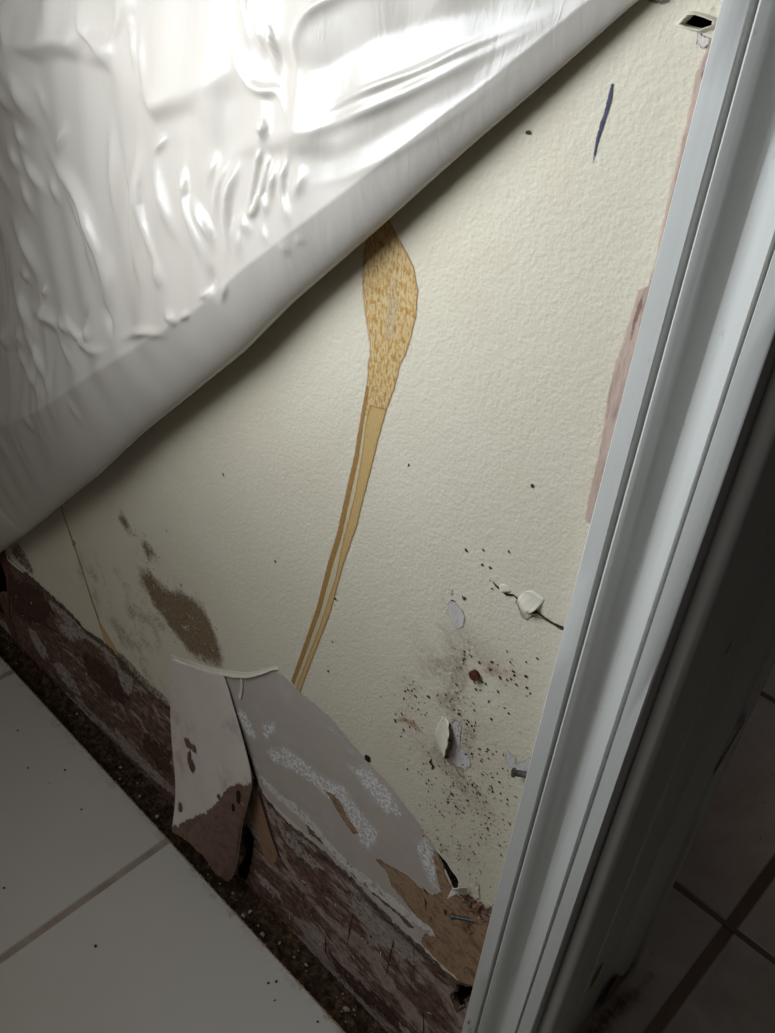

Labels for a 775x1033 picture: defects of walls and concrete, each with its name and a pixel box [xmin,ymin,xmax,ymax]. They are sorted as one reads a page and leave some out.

peeling [585,11,717,523]
peeling [0,550,175,807]
mould [110,506,230,668]
peeling [170,655,494,1033]
mould [394,642,539,883]
peeling [499,584,544,614]
crack [493,582,564,630]